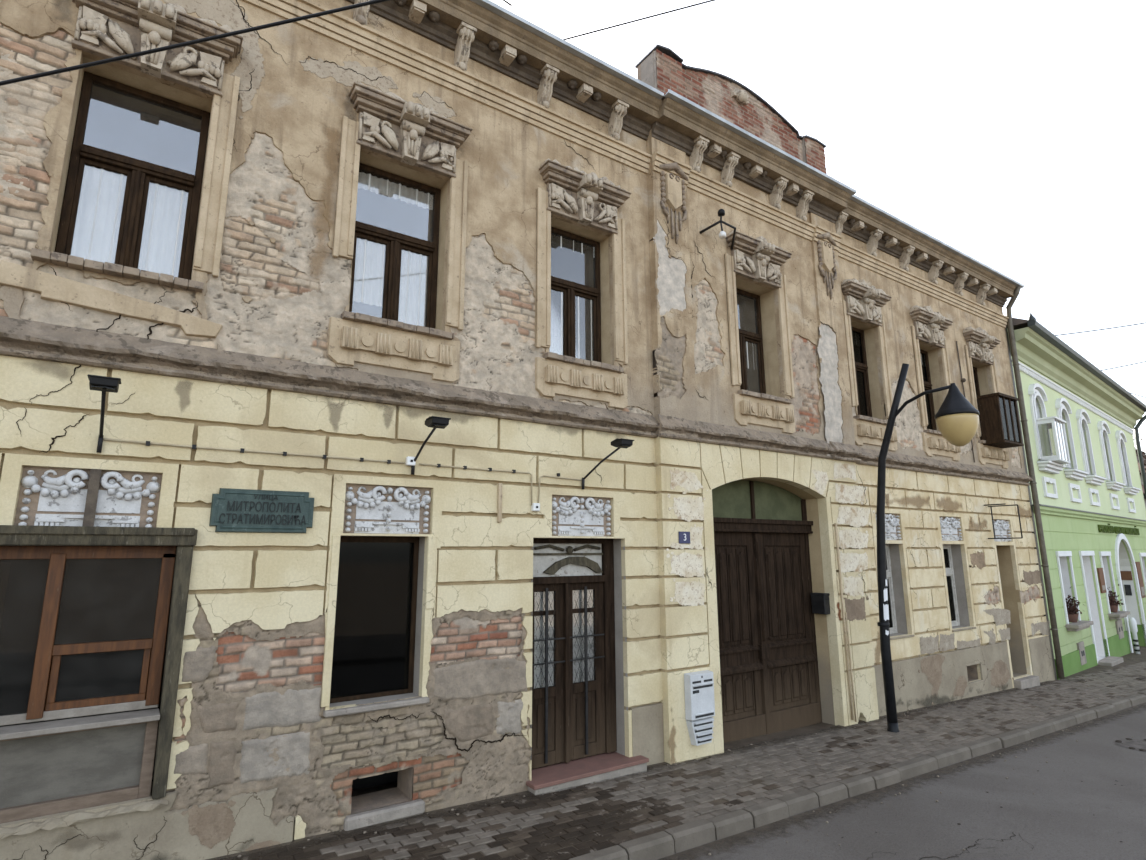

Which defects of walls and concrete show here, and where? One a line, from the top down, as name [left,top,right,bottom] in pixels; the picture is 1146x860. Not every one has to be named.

flaking render [0,23,358,370]
crack [147,291,198,339]
flaking render [450,220,724,415]
crack [16,365,135,453]
flaking render [788,323,875,622]
flaking render [168,597,531,849]
crack [13,834,85,860]
crack [133,817,167,860]
peeling [244,840,281,853]